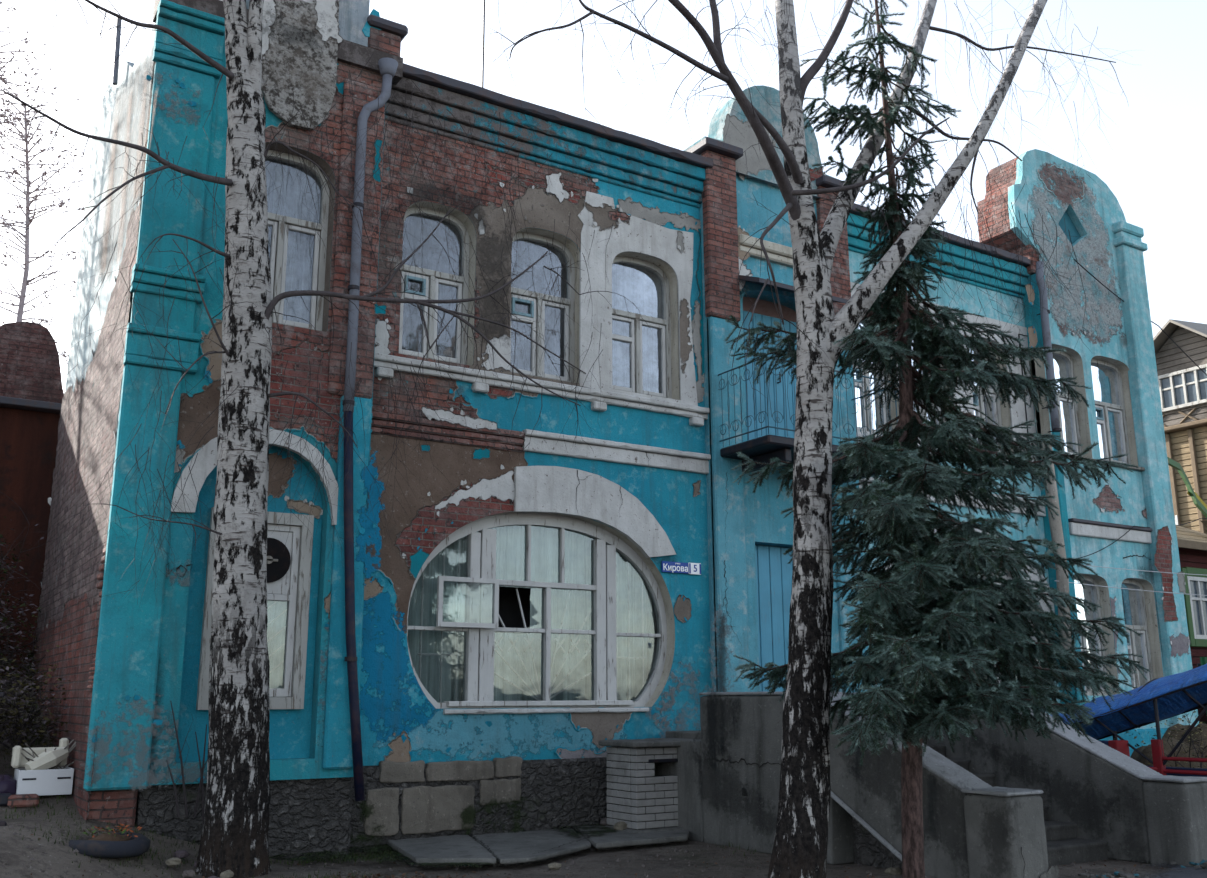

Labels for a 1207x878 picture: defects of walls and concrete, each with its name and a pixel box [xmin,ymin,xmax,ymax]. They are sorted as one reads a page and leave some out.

peeling [262,0,277,60]
peeling [314,0,343,43]
flaking render [265,61,383,463]
peeling [1025,162,1126,348]
flaking render [174,318,222,473]
flaking render [267,451,323,519]
flaking render [356,116,705,762]
flaking render [1093,484,1125,513]
flaking render [1154,526,1190,658]